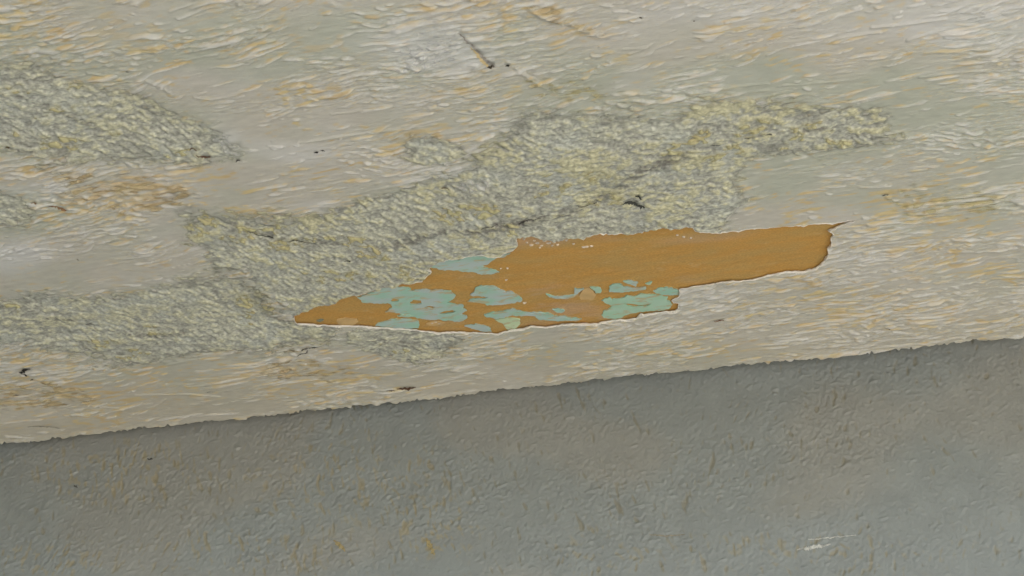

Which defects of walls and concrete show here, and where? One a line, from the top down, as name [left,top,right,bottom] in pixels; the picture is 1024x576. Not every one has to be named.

peeling [293,219,857,336]